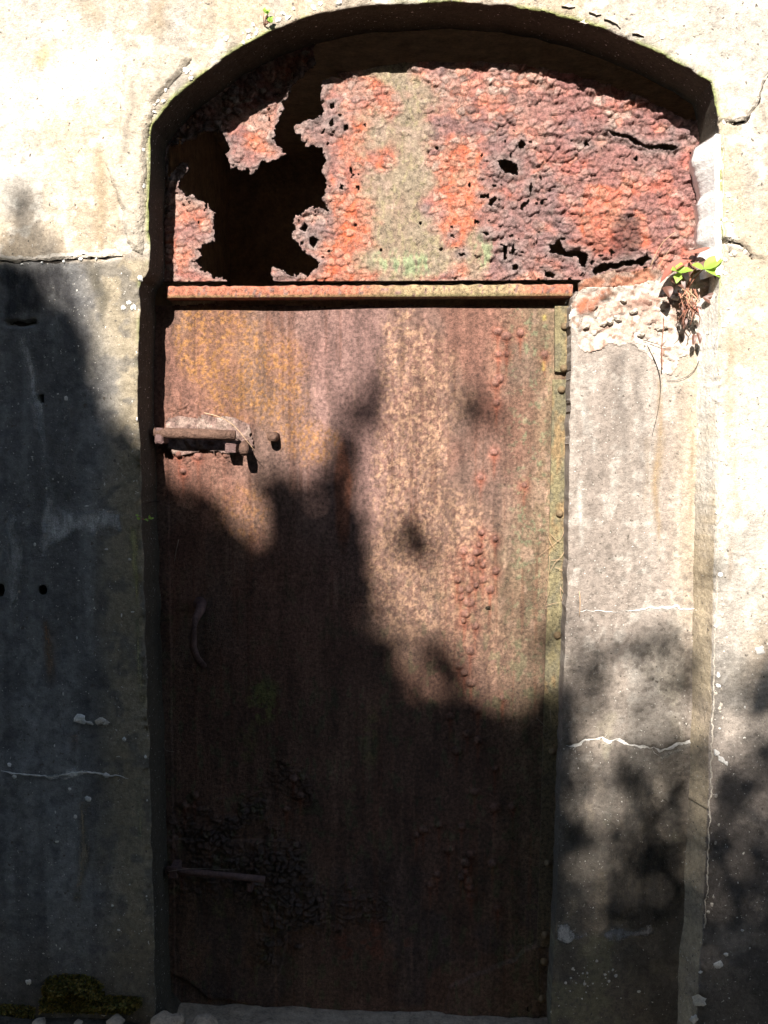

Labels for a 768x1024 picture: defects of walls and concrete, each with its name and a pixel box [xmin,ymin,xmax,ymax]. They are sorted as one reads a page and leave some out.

spalling [578,10,644,37]
spalling [569,258,727,375]
crack [566,74,768,928]
crack [4,769,128,779]